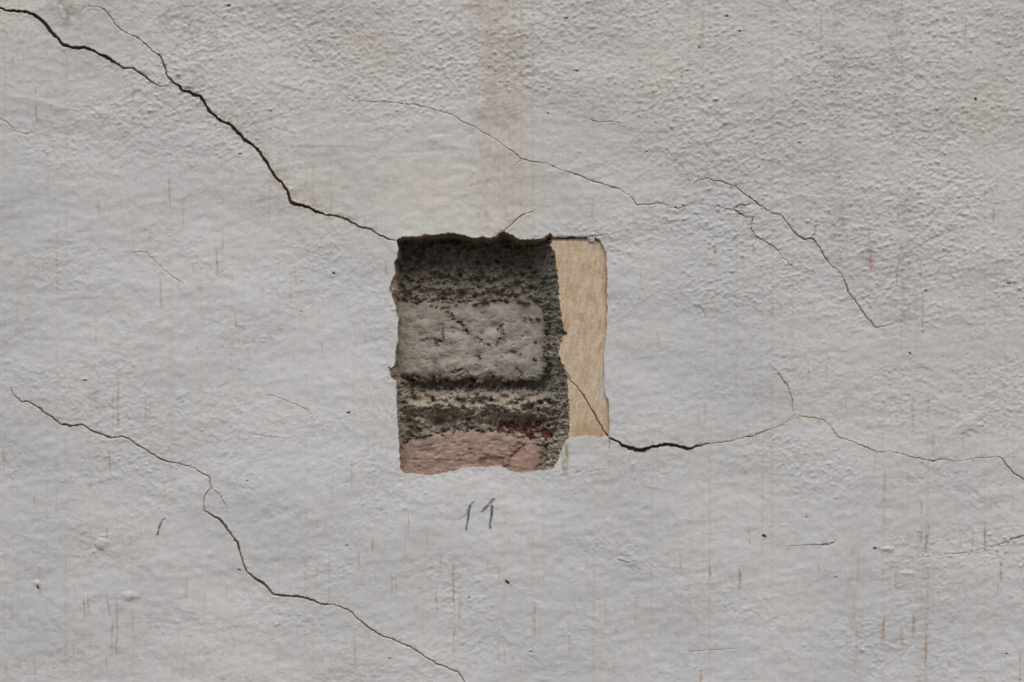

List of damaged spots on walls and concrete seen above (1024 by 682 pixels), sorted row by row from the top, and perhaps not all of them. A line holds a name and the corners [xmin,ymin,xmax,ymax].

crack [0,2,397,244]
crack [346,93,896,331]
crack [7,385,469,682]
spalling [387,230,610,476]
crack [565,360,1024,483]